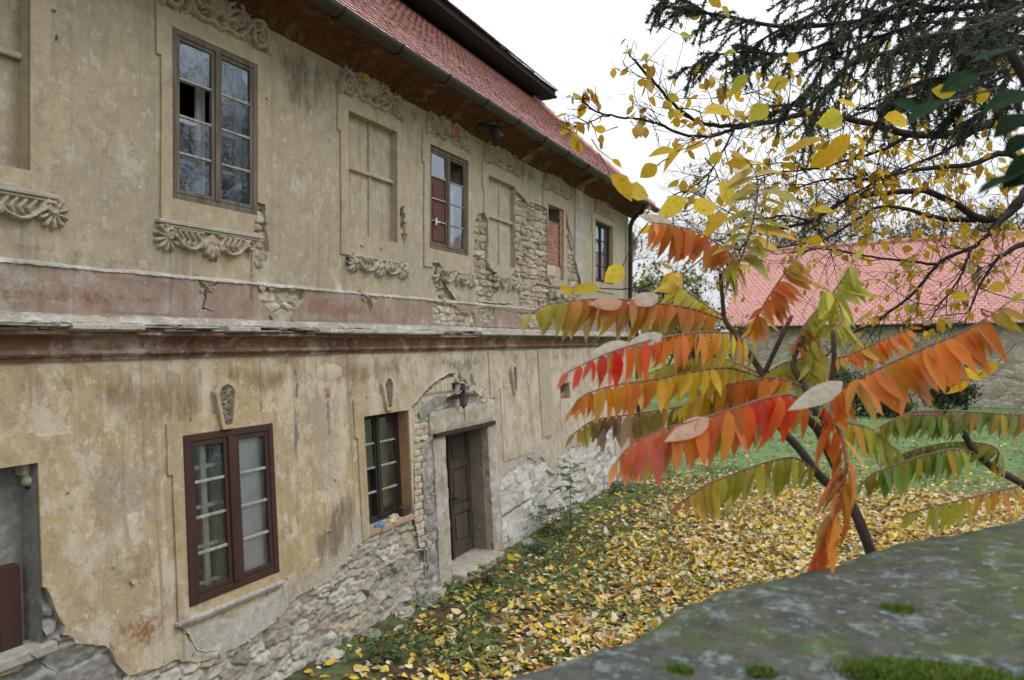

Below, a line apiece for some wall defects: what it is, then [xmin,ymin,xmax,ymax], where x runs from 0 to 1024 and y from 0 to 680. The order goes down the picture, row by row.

flaking render [473,213,500,303]
flaking render [510,190,579,327]
flaking render [0,375,484,680]
flaking render [500,427,617,548]